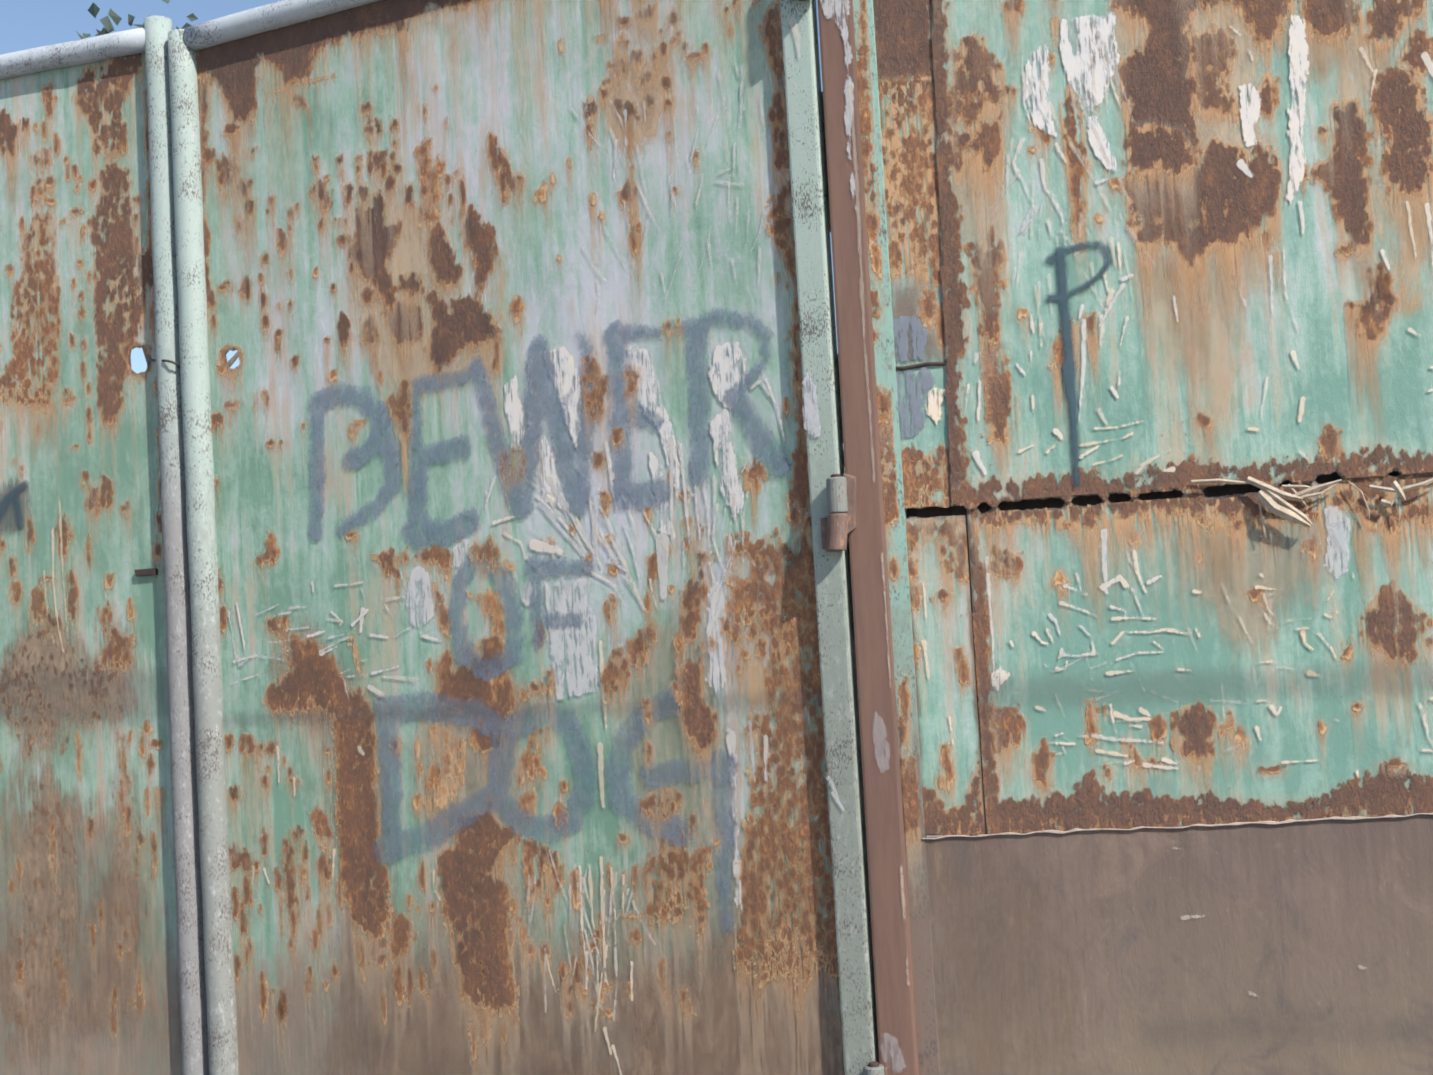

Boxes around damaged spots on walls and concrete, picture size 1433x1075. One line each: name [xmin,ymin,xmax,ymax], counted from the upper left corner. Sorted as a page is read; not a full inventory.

corrosion [0,52,157,449]
corrosion [0,470,162,881]
corrosion [196,0,845,1075]
peeling [1025,46,1057,137]
peeling [1087,111,1117,172]
corrosion [856,0,1433,846]
peeling [1239,83,1261,147]